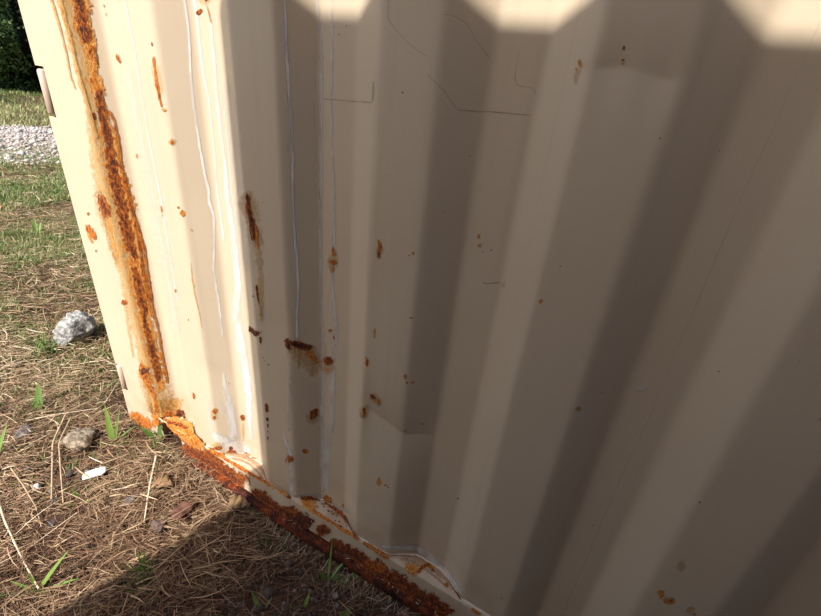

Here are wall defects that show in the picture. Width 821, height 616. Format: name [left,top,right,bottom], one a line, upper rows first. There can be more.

leakage [183,0,252,454]
rust [50,0,455,616]
leakage [283,0,300,338]